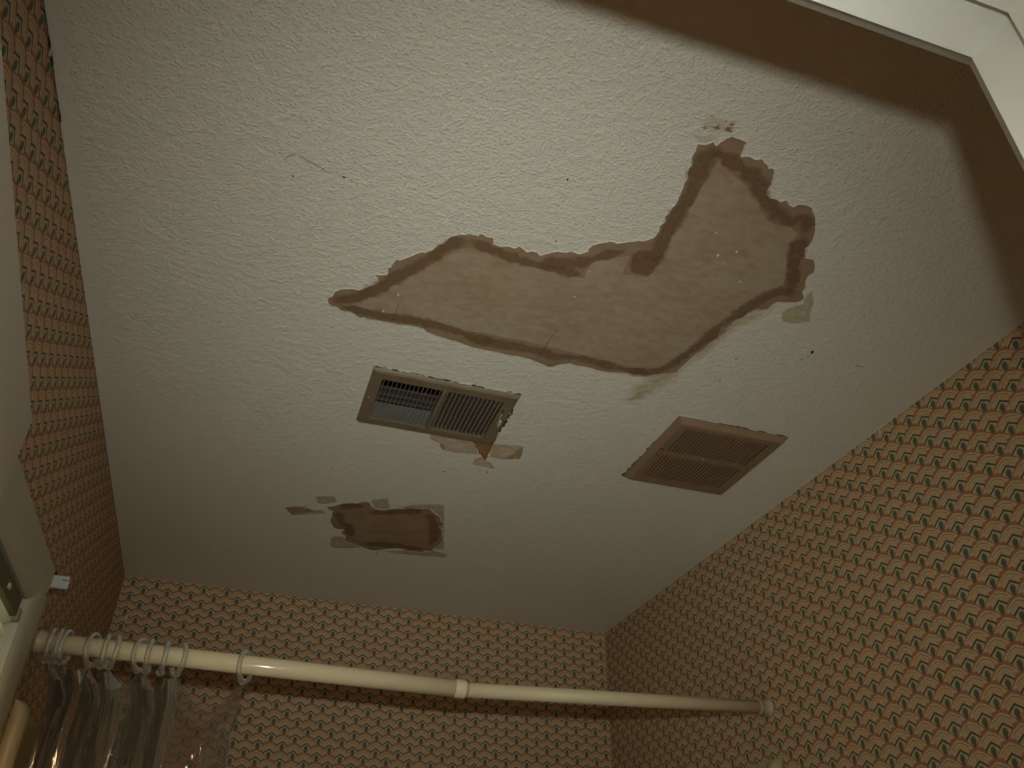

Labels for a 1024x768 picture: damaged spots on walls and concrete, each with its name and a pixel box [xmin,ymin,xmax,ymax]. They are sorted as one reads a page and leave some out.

peeling [326,135,817,376]
peeling [326,501,445,553]